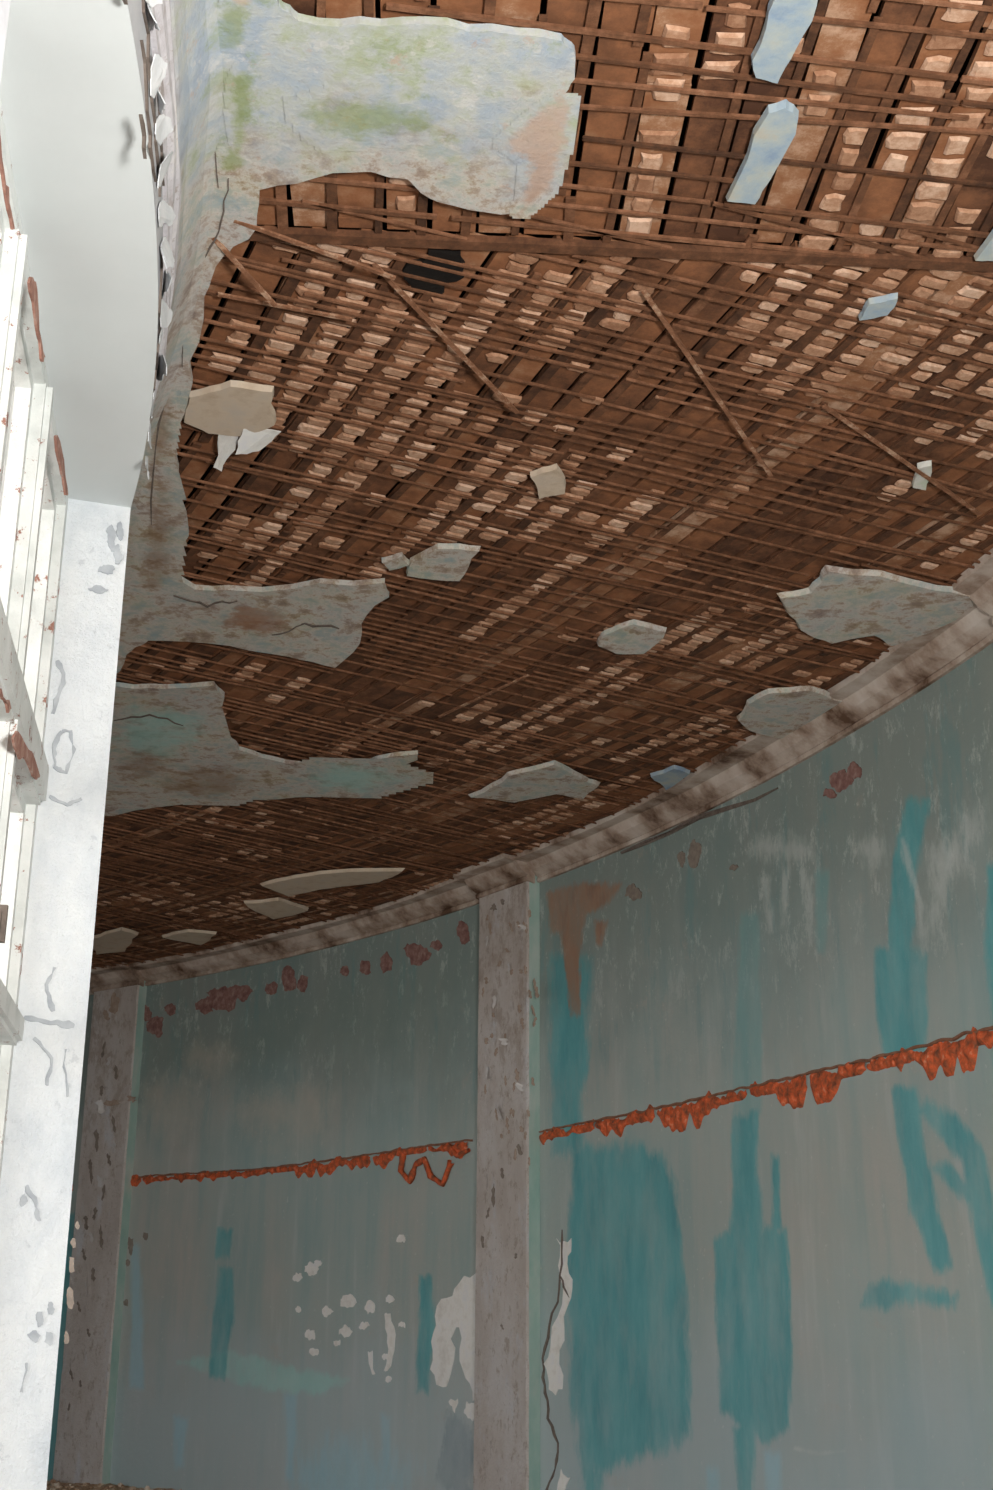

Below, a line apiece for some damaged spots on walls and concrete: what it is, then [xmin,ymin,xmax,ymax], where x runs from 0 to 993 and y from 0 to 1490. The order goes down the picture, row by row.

flaking render [88,0,581,708]
flaking render [104,779,182,816]
flaking render [203,738,323,800]
flaking render [370,750,418,764]
peeling [823,761,862,799]
peeling [162,929,217,945]
peeling [243,897,309,919]
rust [543,873,626,1025]
flaking render [340,899,993,1248]
peeling [305,1294,405,1383]
flaking render [430,1273,476,1421]
crack [541,1230,569,1490]